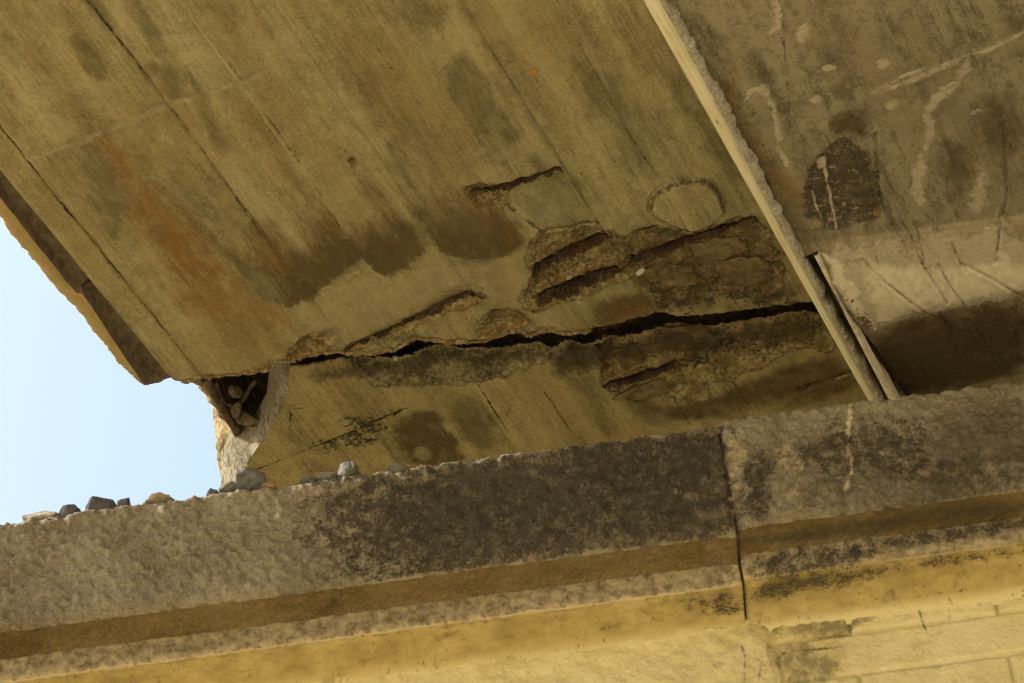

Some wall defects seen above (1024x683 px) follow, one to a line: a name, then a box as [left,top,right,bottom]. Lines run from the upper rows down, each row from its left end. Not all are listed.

spalling [464,166,564,212]
damp [242,214,424,308]
spalling [181,179,835,427]
damp [395,412,465,464]
crack [719,426,732,527]
damp [680,518,1024,616]